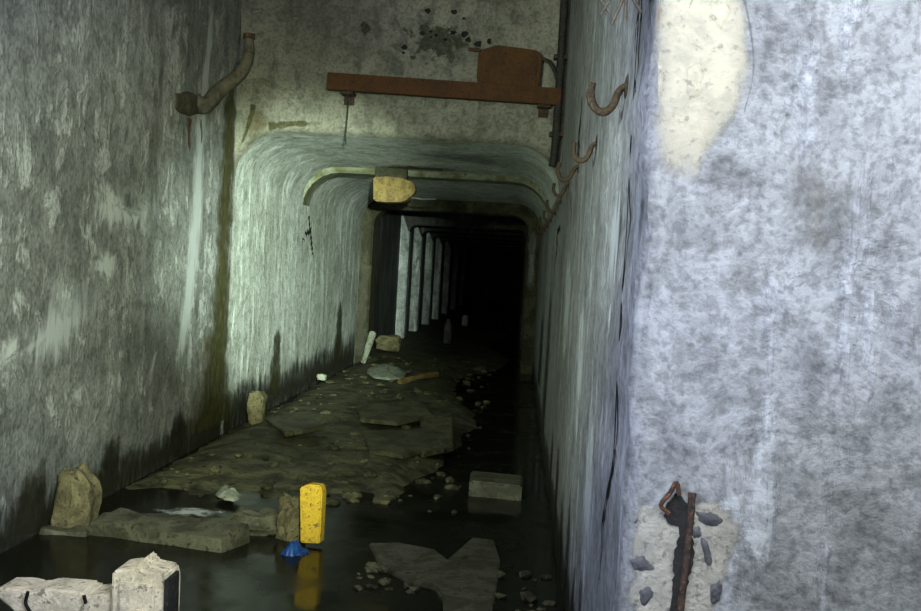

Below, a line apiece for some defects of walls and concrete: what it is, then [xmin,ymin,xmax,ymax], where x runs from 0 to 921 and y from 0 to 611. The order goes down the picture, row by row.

mould [402,8,492,65]
crack [632,0,640,98]
crack [619,179,630,341]
crack [599,382,618,580]
spalling [629,481,739,611]